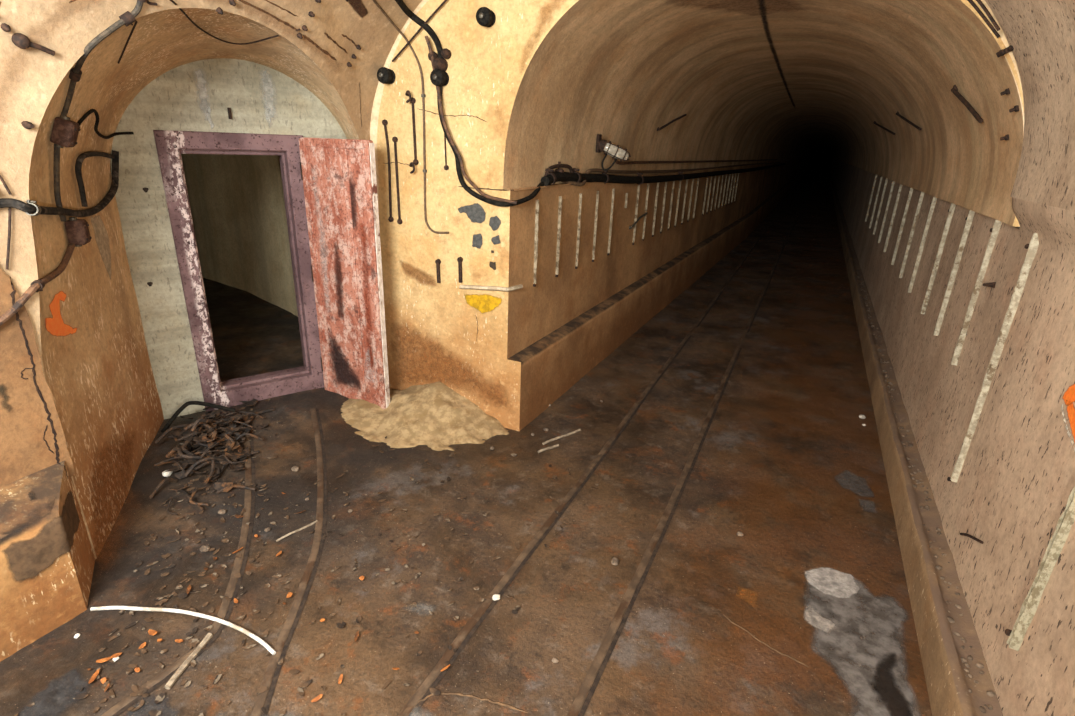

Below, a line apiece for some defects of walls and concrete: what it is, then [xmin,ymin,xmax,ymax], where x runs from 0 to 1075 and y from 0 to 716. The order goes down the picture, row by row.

rust [335,246,343,318]
rust [349,180,372,365]